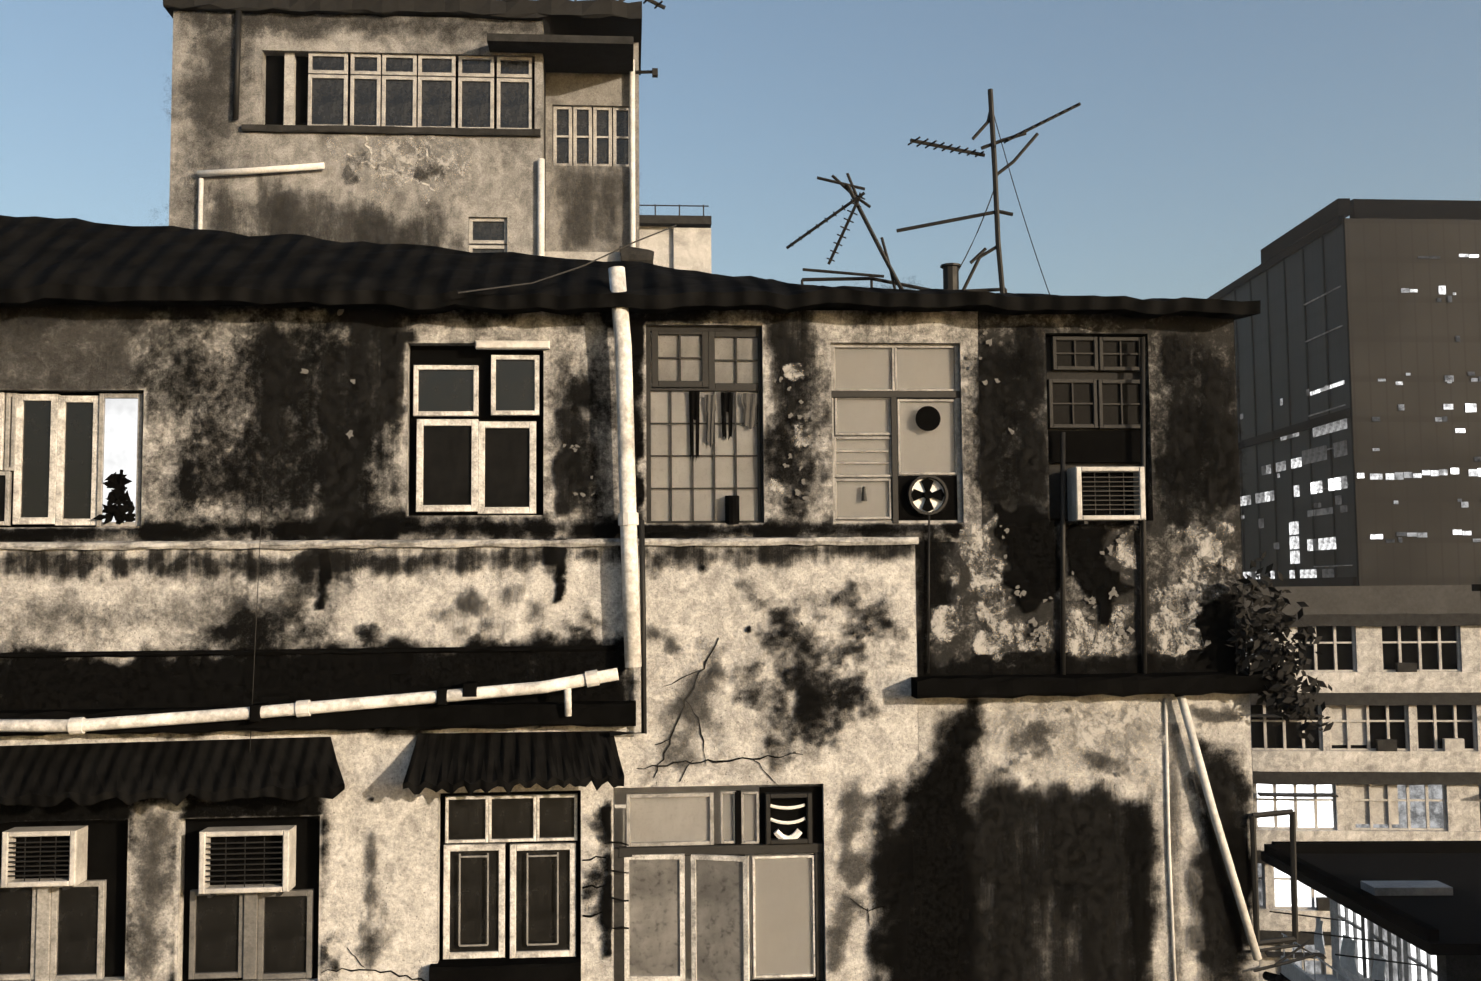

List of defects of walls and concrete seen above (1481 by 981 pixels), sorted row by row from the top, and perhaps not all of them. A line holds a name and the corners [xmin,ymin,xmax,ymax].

water stain [210,177,462,247]
water stain [560,168,626,250]
water stain [0,303,1241,773]
crack [637,638,803,787]
water stain [827,698,1163,981]